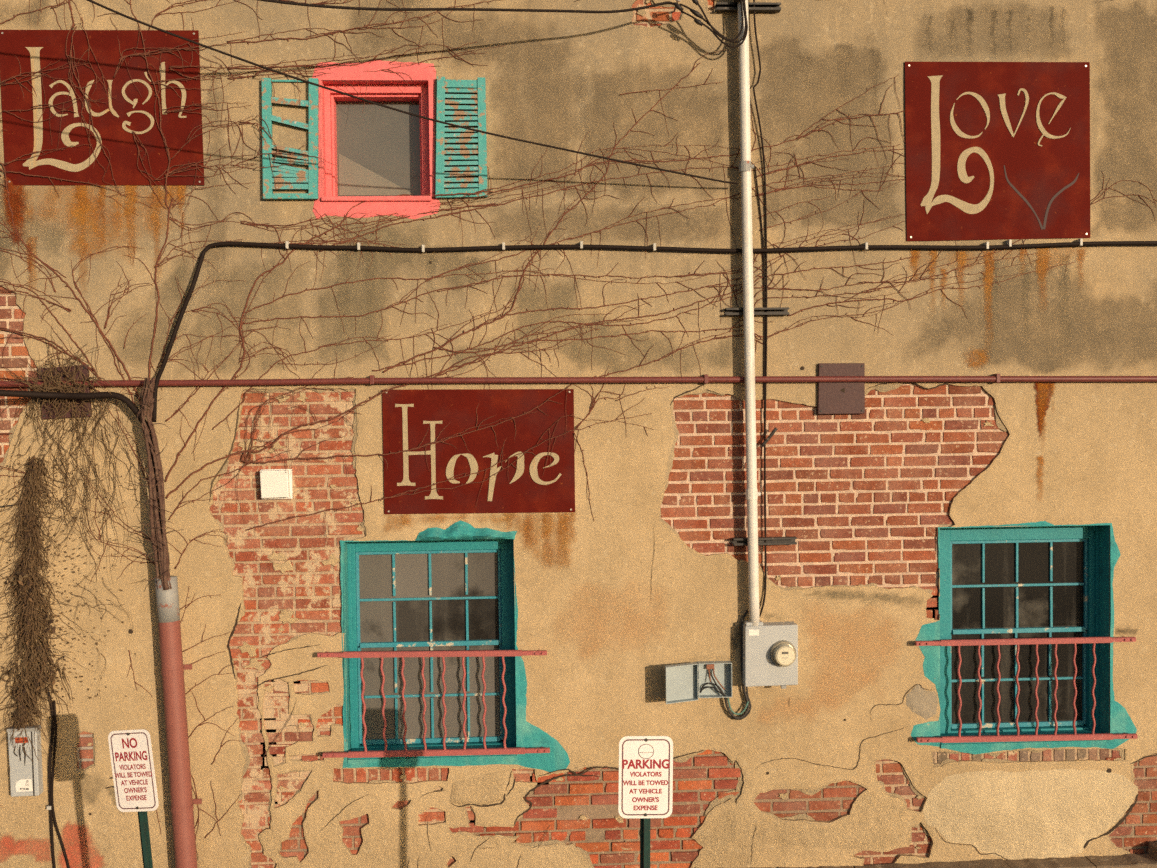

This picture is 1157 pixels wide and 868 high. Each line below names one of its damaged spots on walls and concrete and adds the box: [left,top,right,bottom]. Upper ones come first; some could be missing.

damp [1097,4,1157,229]
corrosion [4,177,32,270]
corrosion [69,185,185,253]
flaking render [0,286,38,472]
corrosion [1034,382,1055,435]
flaking render [658,382,1012,621]
flaking render [209,385,935,868]
crack [763,684,928,770]
crack [408,766,619,868]
flaking render [931,746,1157,854]